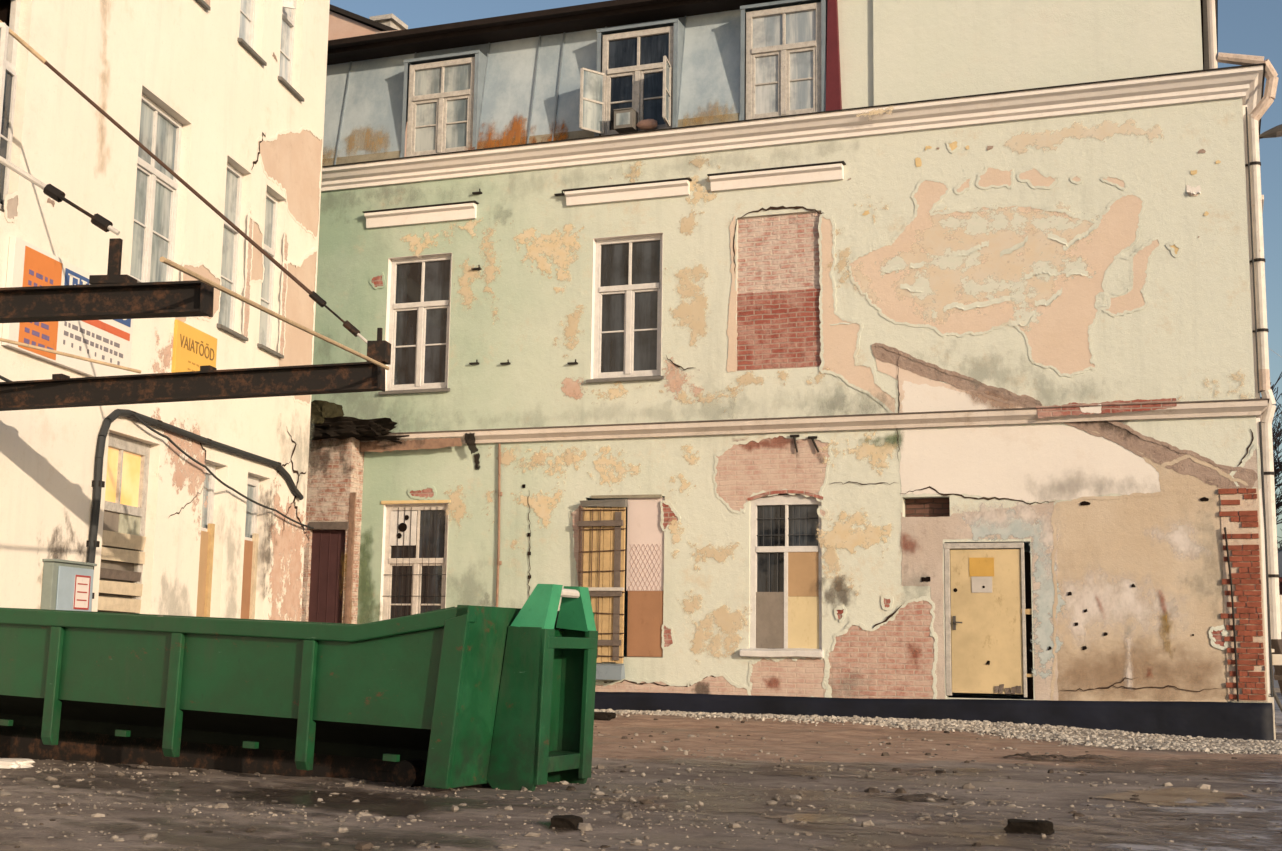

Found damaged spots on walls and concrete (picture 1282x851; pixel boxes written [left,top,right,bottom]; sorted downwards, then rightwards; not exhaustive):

crack [251,132,266,170]
rust [473,116,568,149]
peeling [242,203,265,338]
peeling [257,126,323,367]
peeling [659,216,764,412]
peeling [806,118,1182,413]
peeling [153,408,208,533]
crack [277,431,309,540]
crack [522,484,531,598]
flaking render [595,421,1261,702]
crack [831,352,1048,505]
crack [596,675,714,687]